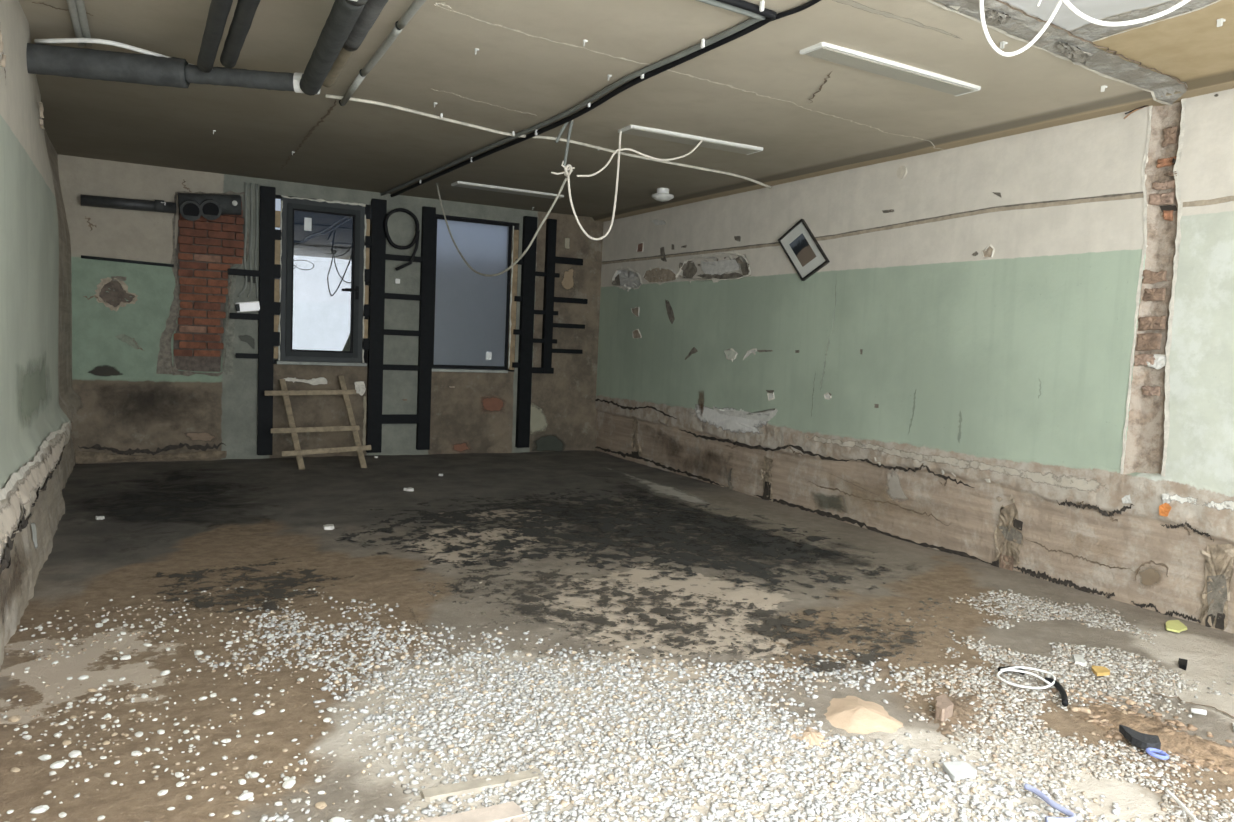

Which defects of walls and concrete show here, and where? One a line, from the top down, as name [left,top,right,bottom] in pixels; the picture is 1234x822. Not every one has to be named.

spalling [95,276,138,312]
flaking render [170,191,249,376]
flaking render [1120,98,1187,477]
flaking render [0,433,66,556]
crack [0,442,225,579]
water stain [335,473,927,679]
crack [595,399,1201,623]
crack [1162,522,1214,542]
flaking render [1159,493,1234,517]